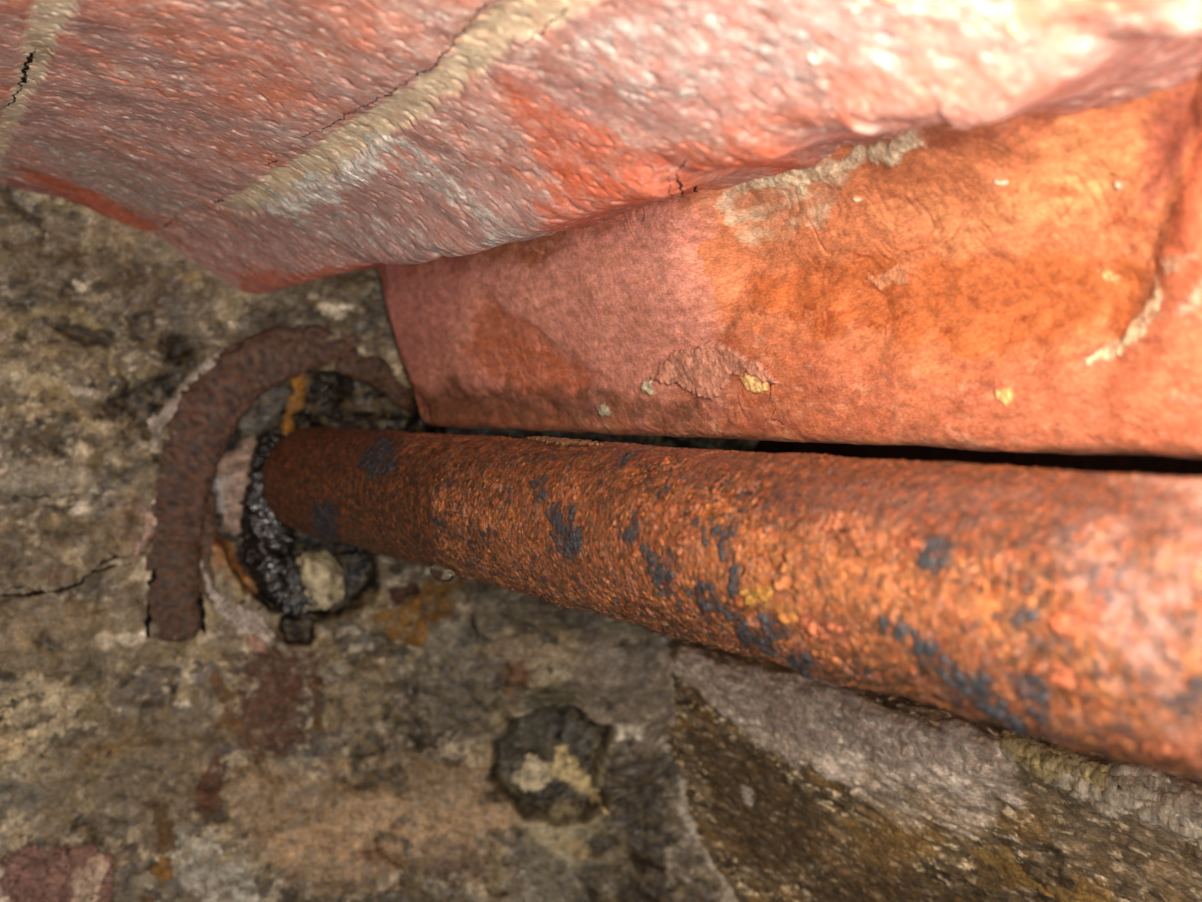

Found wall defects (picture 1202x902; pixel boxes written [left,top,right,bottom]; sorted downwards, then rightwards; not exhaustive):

crack [8,50,36,106]
spalling [697,69,1202,369]
peeling [650,341,779,400]
corrosion [526,436,603,446]
crack [0,555,158,640]
corrosion [371,577,463,647]
corrosion [210,634,325,764]
corrosion [193,756,226,820]